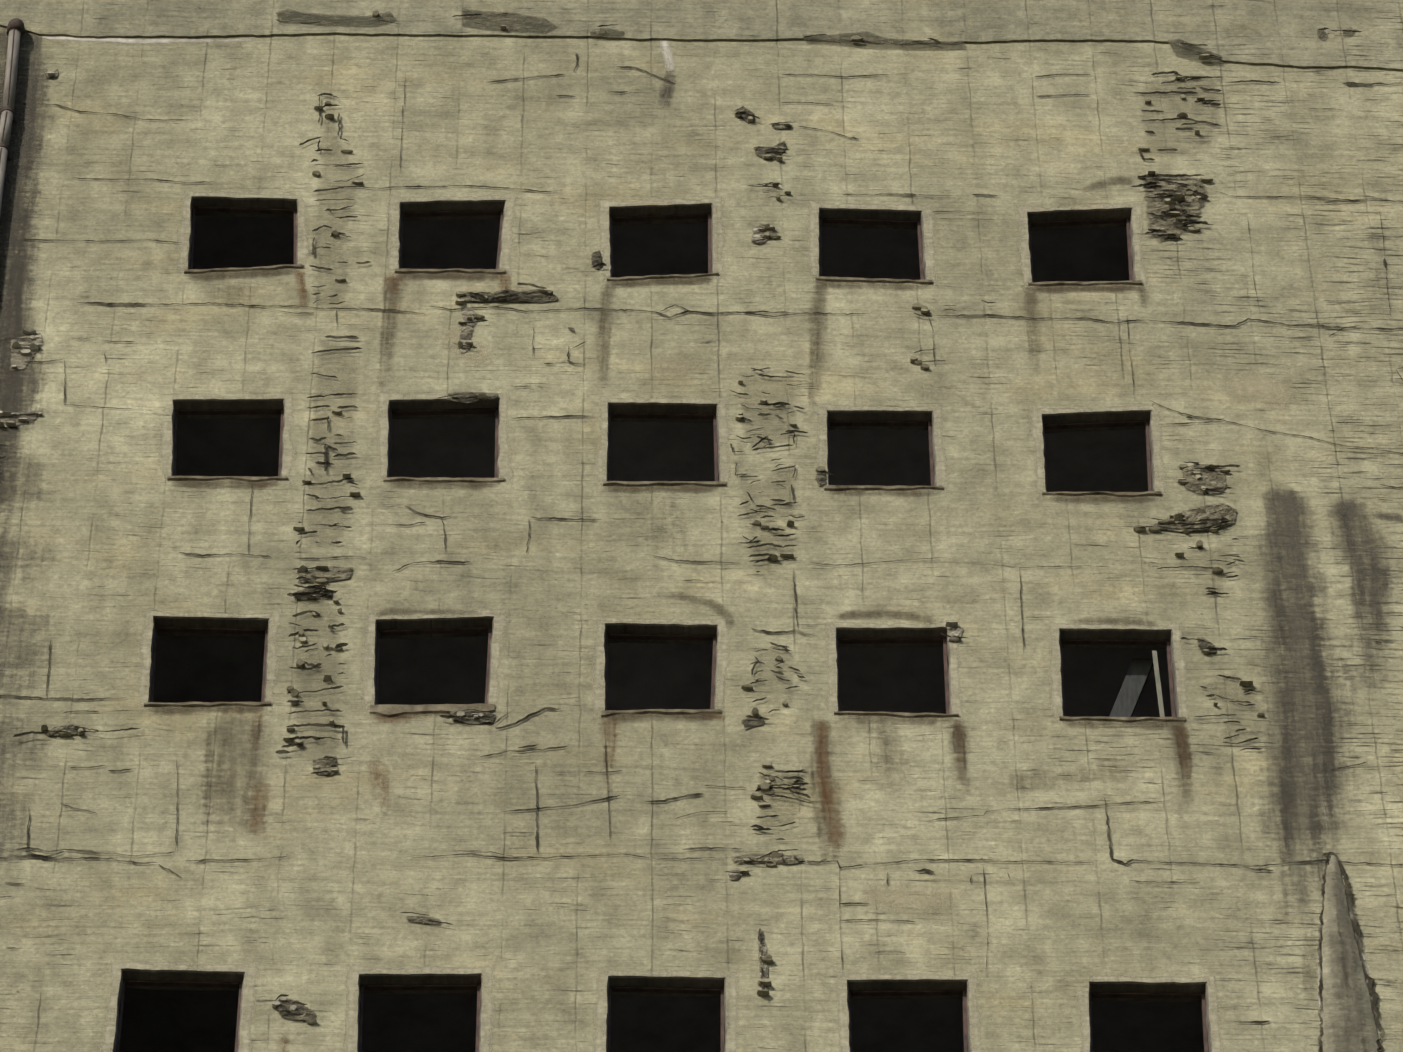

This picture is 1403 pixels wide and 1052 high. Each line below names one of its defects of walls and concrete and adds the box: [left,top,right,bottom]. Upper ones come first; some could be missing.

crack [486,53,578,97]
crack [610,66,675,93]
spalling [1131,39,1281,241]
damp [0,31,235,503]
damp [0,541,32,677]
spalling [275,565,353,775]
spalling [730,364,808,572]
spalling [1133,461,1245,595]
damp [1265,490,1348,851]
damp [1334,502,1402,655]
crack [0,760,286,898]
spalling [724,762,814,880]